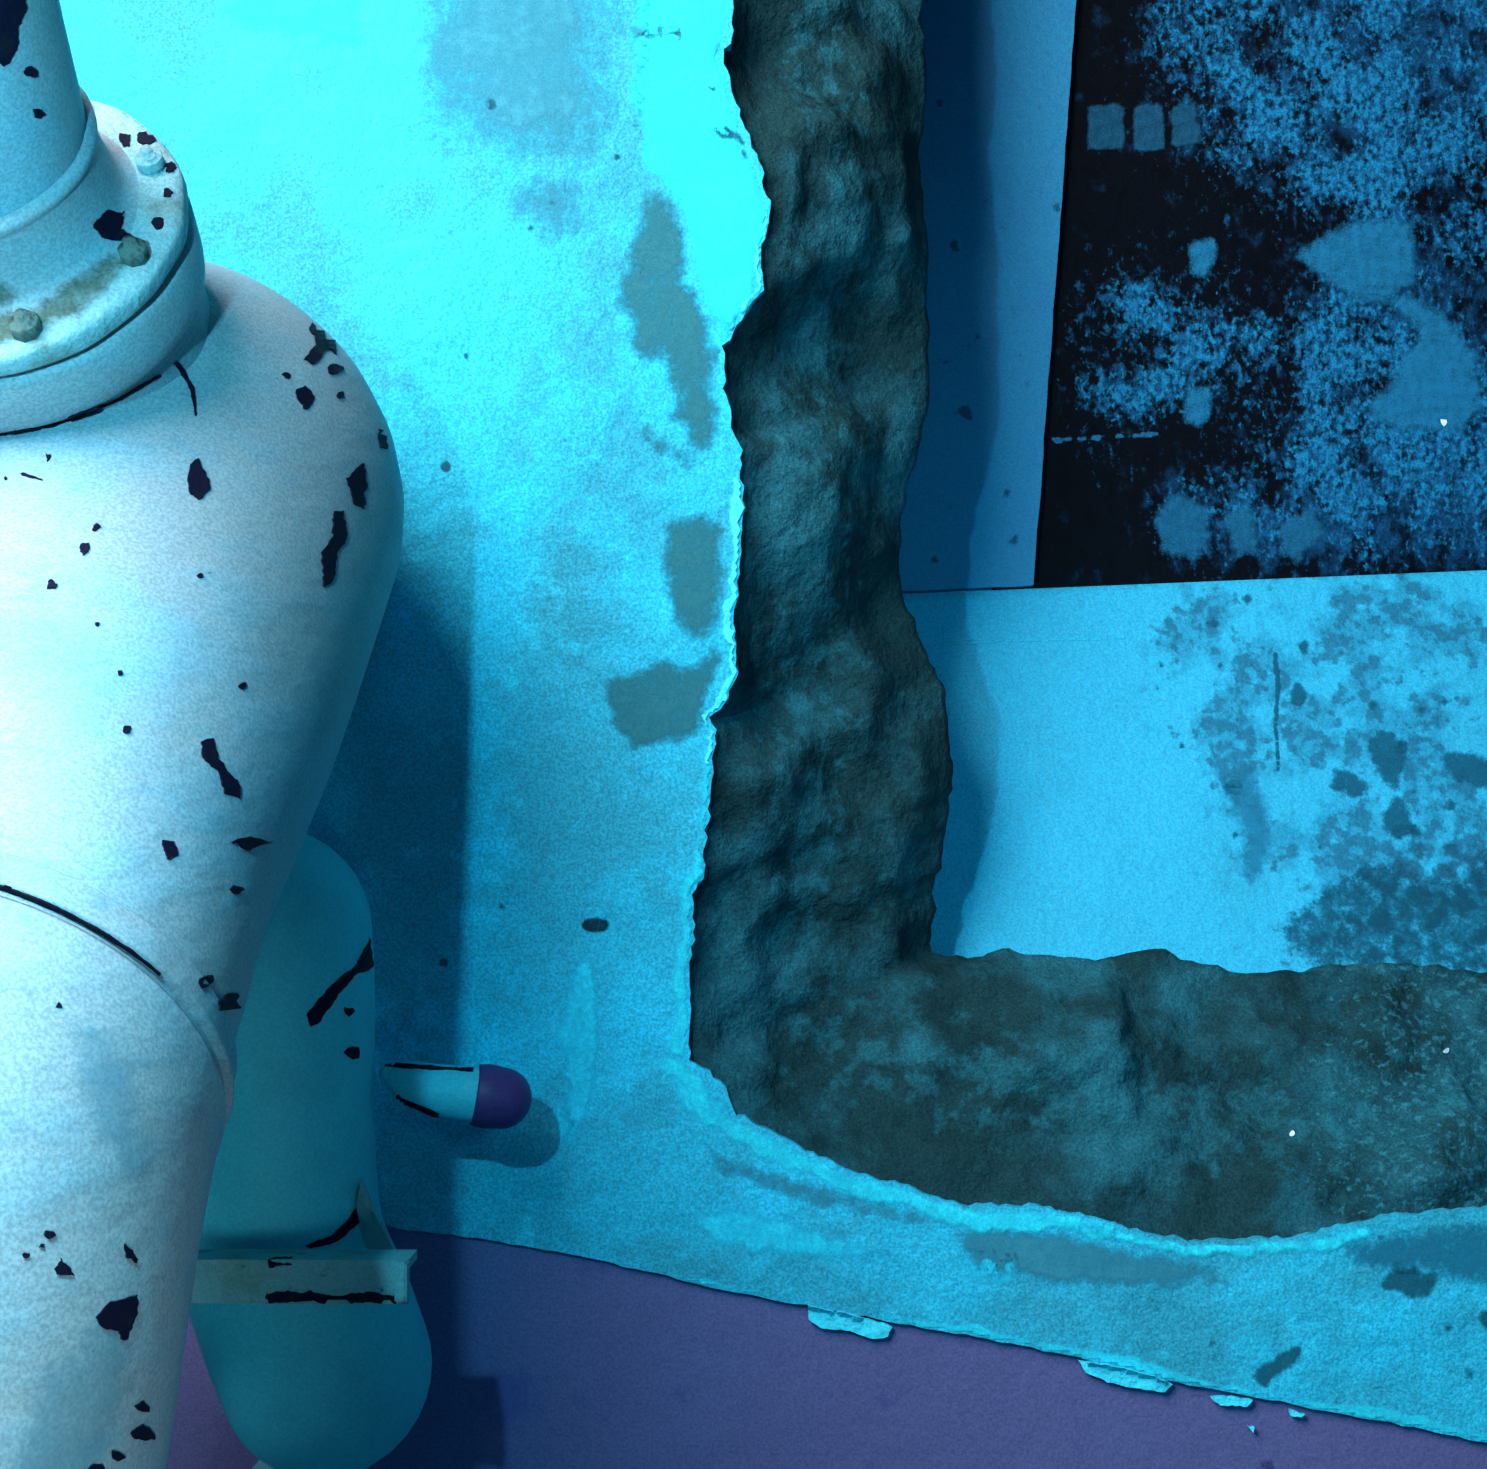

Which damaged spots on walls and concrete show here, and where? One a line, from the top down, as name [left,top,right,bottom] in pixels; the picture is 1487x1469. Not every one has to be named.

water stain [431,0,606,150]
water stain [619,198,719,446]
water stain [665,516,722,636]
water stain [608,651,720,746]
flaking render [699,477,744,824]
water stain [1291,683,1306,706]
water stain [1224,778,1265,877]
water stain [1330,730,1420,839]
water stain [1443,752,1487,787]
flaking render [660,846,1370,1256]